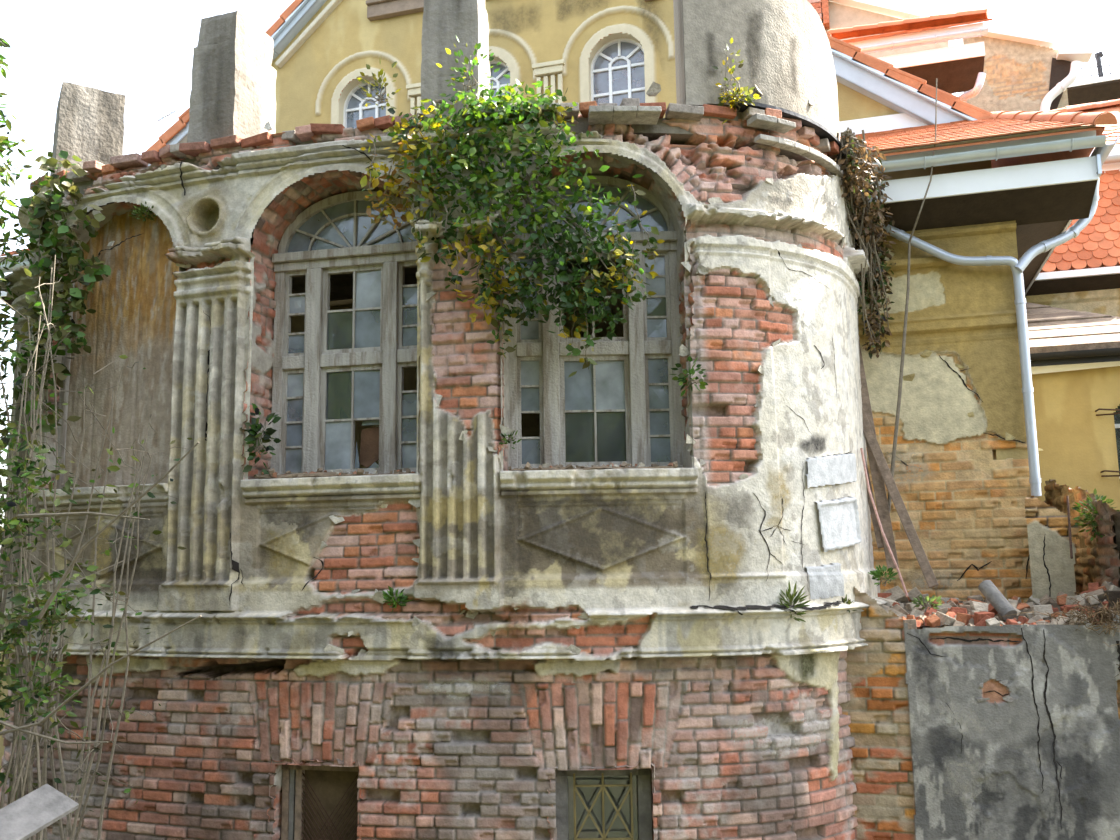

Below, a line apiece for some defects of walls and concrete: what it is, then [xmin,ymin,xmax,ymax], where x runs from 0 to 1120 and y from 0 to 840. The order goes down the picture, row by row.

spalling [646,82,661,96]
spalling [426,224,514,454]
spalling [560,114,946,486]
spalling [285,499,658,657]
crack [690,468,842,615]
spalling [860,344,1079,603]
crack [957,561,992,581]
crack [1026,537,1051,597]
crack [907,628,1062,830]
spalling [977,679,1014,707]